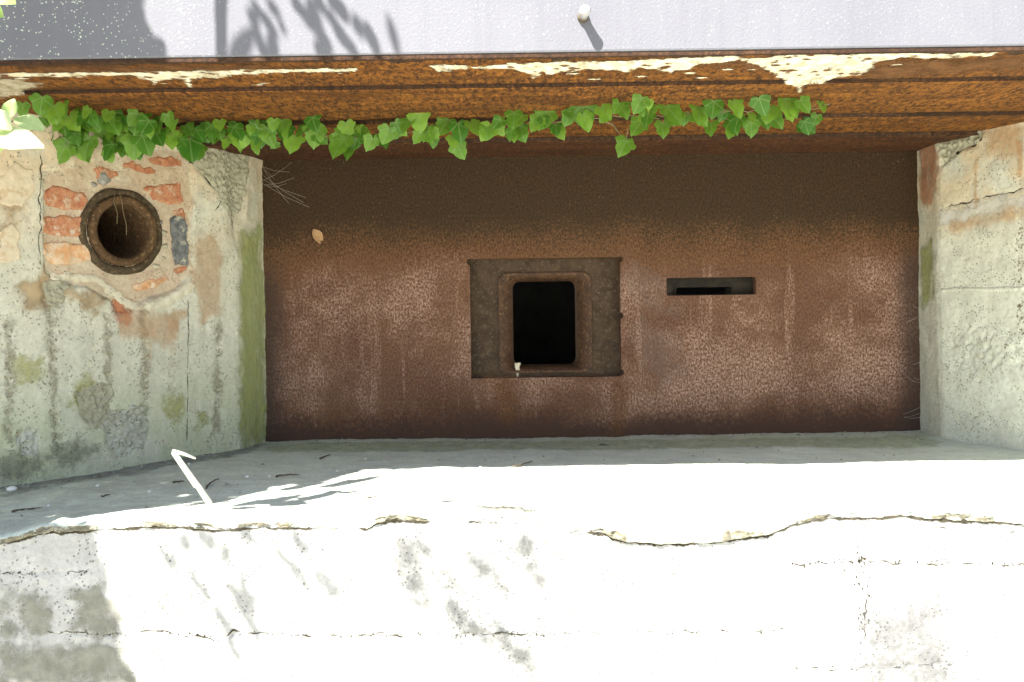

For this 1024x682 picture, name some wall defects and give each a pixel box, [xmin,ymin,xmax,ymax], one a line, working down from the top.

peeling [0,68,357,97]
peeling [430,52,997,92]
crack [941,188,1023,211]
flaking render [0,146,250,312]
crack [0,526,312,545]
crack [359,518,430,531]
crack [586,515,1024,673]